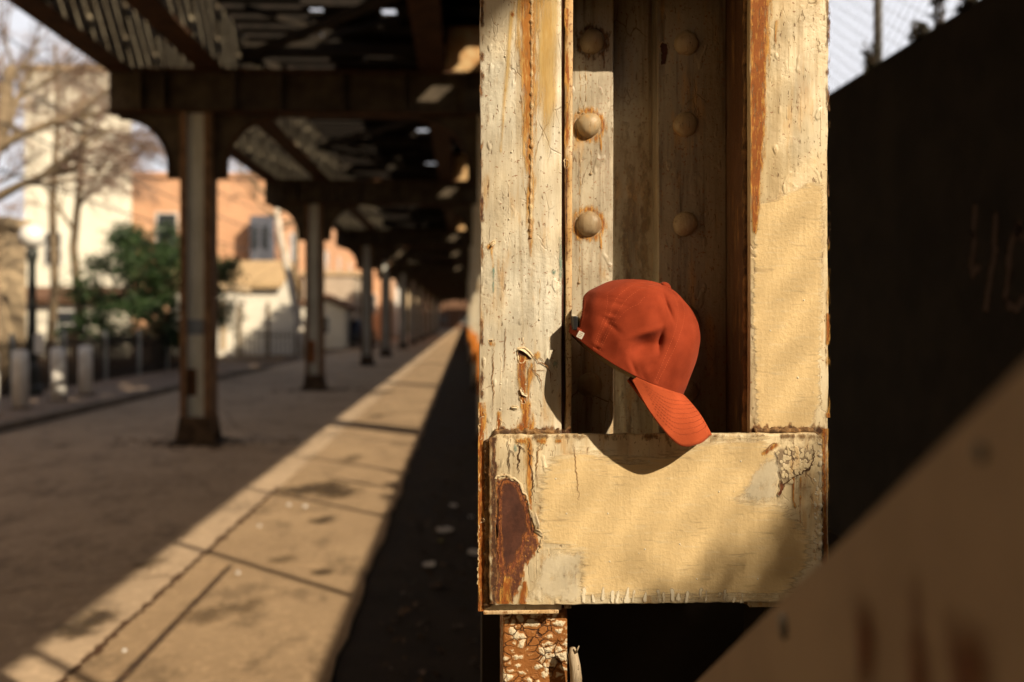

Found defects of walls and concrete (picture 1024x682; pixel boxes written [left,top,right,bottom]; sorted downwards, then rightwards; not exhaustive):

corrosion [511,0,543,255]
corrosion [564,8,609,259]
corrosion [751,0,777,234]
crack [486,328,551,500]
peeling [517,347,534,363]
corrosion [468,319,585,611]
crack [764,443,815,484]
corrosion [751,407,830,559]